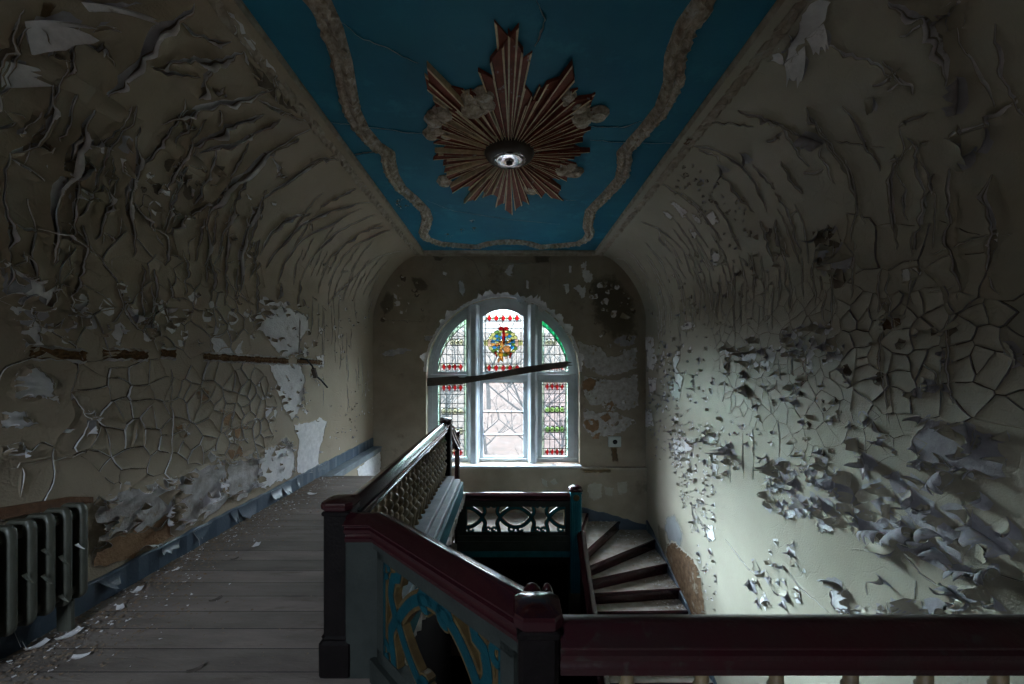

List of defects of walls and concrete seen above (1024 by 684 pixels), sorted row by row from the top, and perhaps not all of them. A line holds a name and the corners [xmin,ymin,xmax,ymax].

peeling [0,0,160,88]
peeling [141,158,227,220]
peeling [0,258,373,590]
crack [0,0,400,529]
peeling [420,260,1023,614]
peeling [764,0,836,88]
crack [592,0,1024,483]